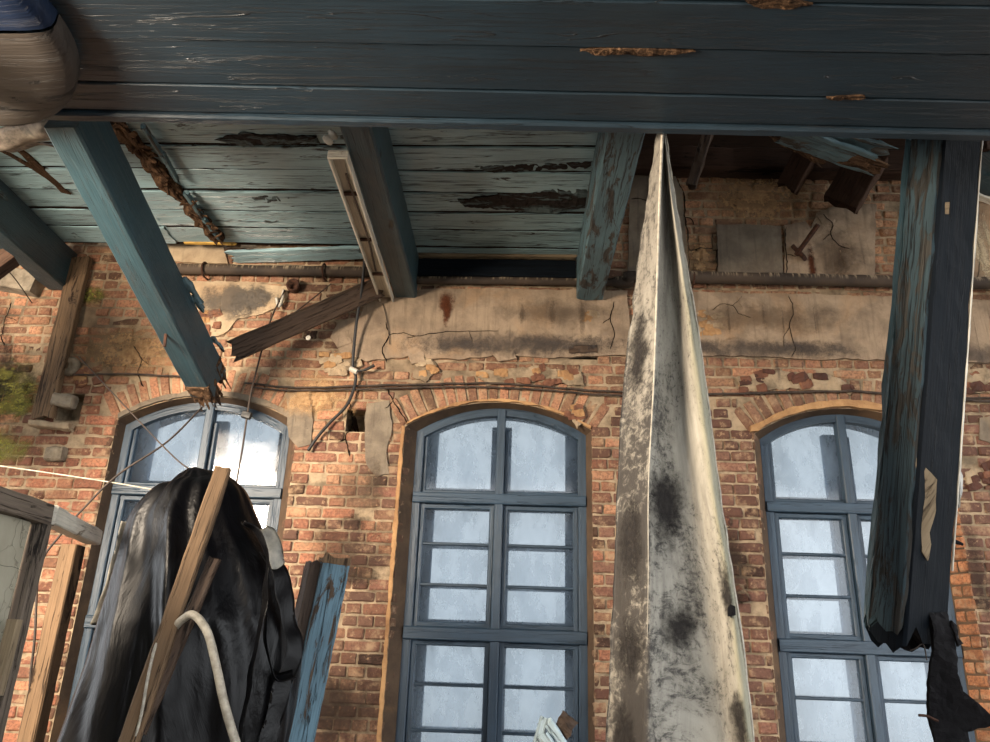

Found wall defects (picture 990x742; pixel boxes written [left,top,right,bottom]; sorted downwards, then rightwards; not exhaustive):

leakage [203,285,271,317]
crack [783,227,796,356]
crack [382,324,491,362]
spalling [564,403,586,428]
spalling [965,460,990,491]